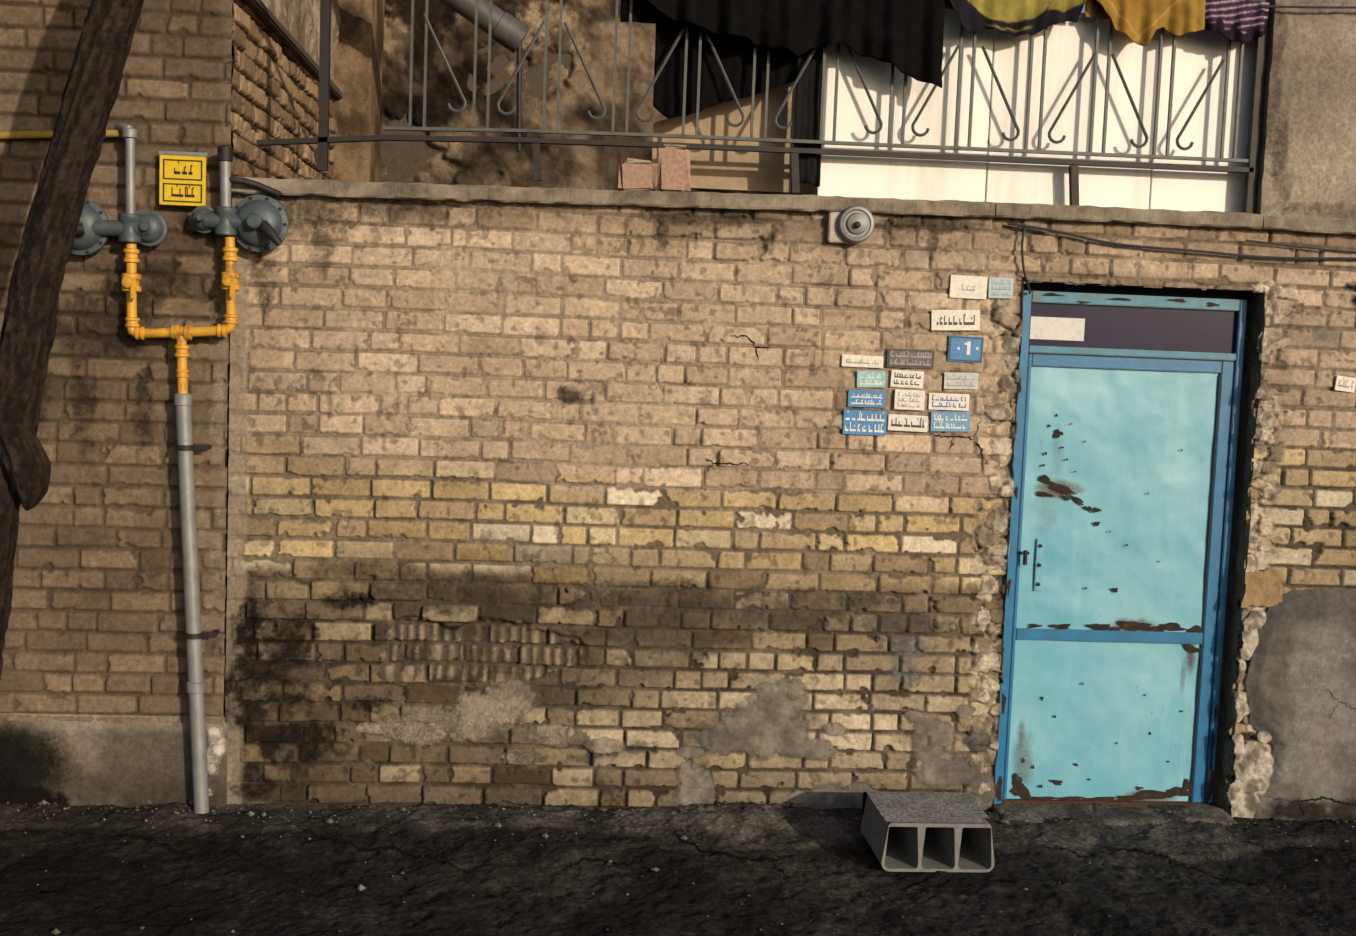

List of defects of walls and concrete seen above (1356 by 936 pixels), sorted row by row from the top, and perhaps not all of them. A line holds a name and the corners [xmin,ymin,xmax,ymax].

leakage [208,343,225,467]
leakage [324,560,554,613]
spalling [956,298,1022,801]
spalling [1227,280,1285,819]
spalling [377,616,578,693]
corrosion [1029,620,1202,678]
leakage [225,599,344,798]
leakage [352,695,388,713]
peeling [355,722,386,735]
peeling [822,722,848,736]
corrosion [1011,704,1218,805]